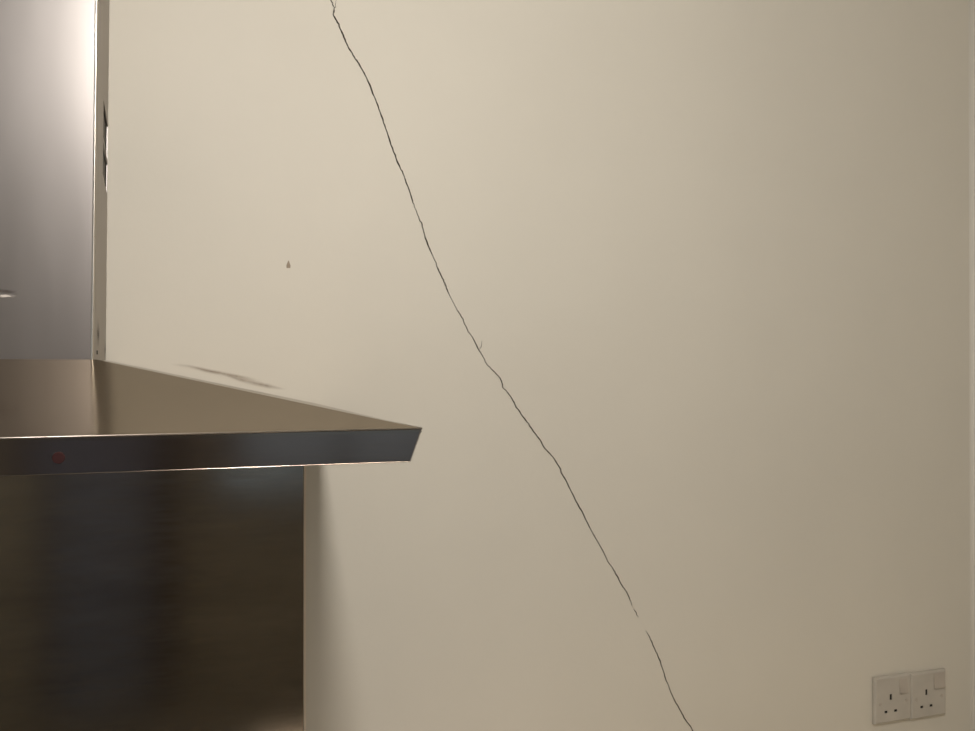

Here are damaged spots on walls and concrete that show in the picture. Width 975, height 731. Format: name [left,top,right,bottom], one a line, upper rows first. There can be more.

crack [330,0,693,731]